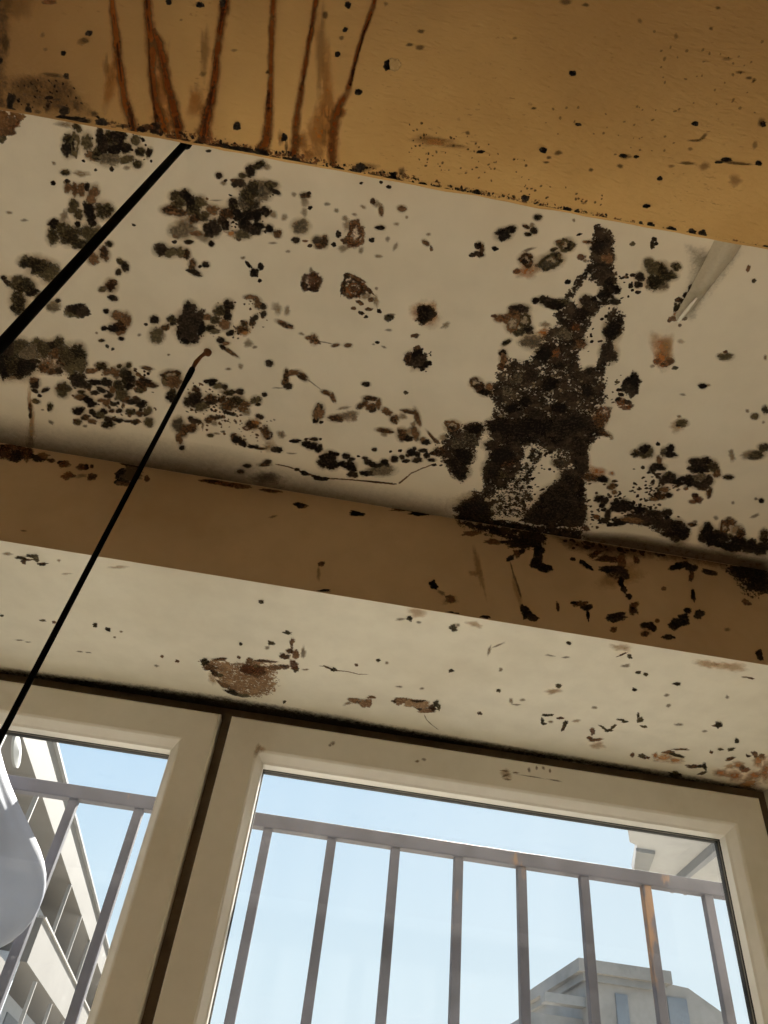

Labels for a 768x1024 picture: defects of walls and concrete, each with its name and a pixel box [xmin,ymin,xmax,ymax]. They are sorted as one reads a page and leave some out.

rust [0,0,442,187]
water stain [0,122,768,640]
peeling [198,630,308,704]
peeling [346,696,376,708]
peeling [391,698,441,729]